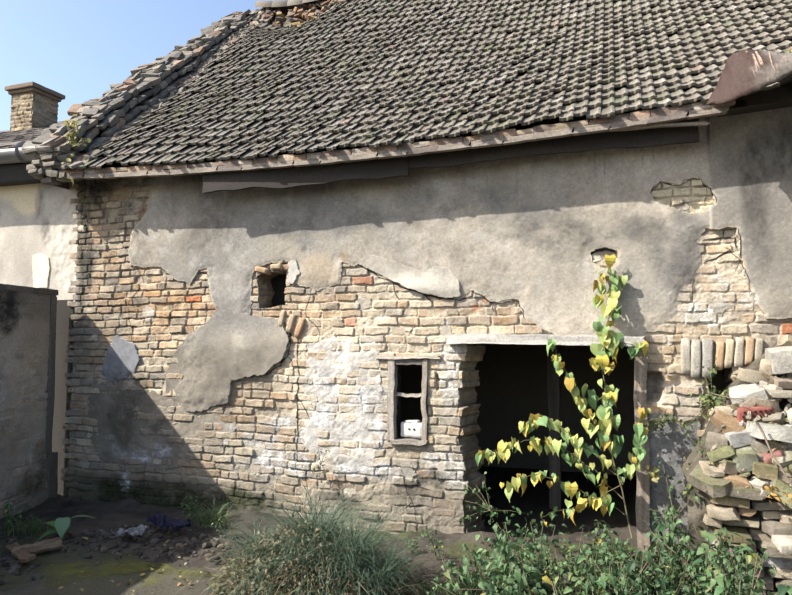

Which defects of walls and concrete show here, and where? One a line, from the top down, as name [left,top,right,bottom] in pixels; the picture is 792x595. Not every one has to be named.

crack [248,322,309,472]
flaking render [61,177,554,534]
flaking render [590,250,618,268]
flaking render [650,178,714,214]
flaking render [624,228,792,438]
peeling [737,464,791,499]